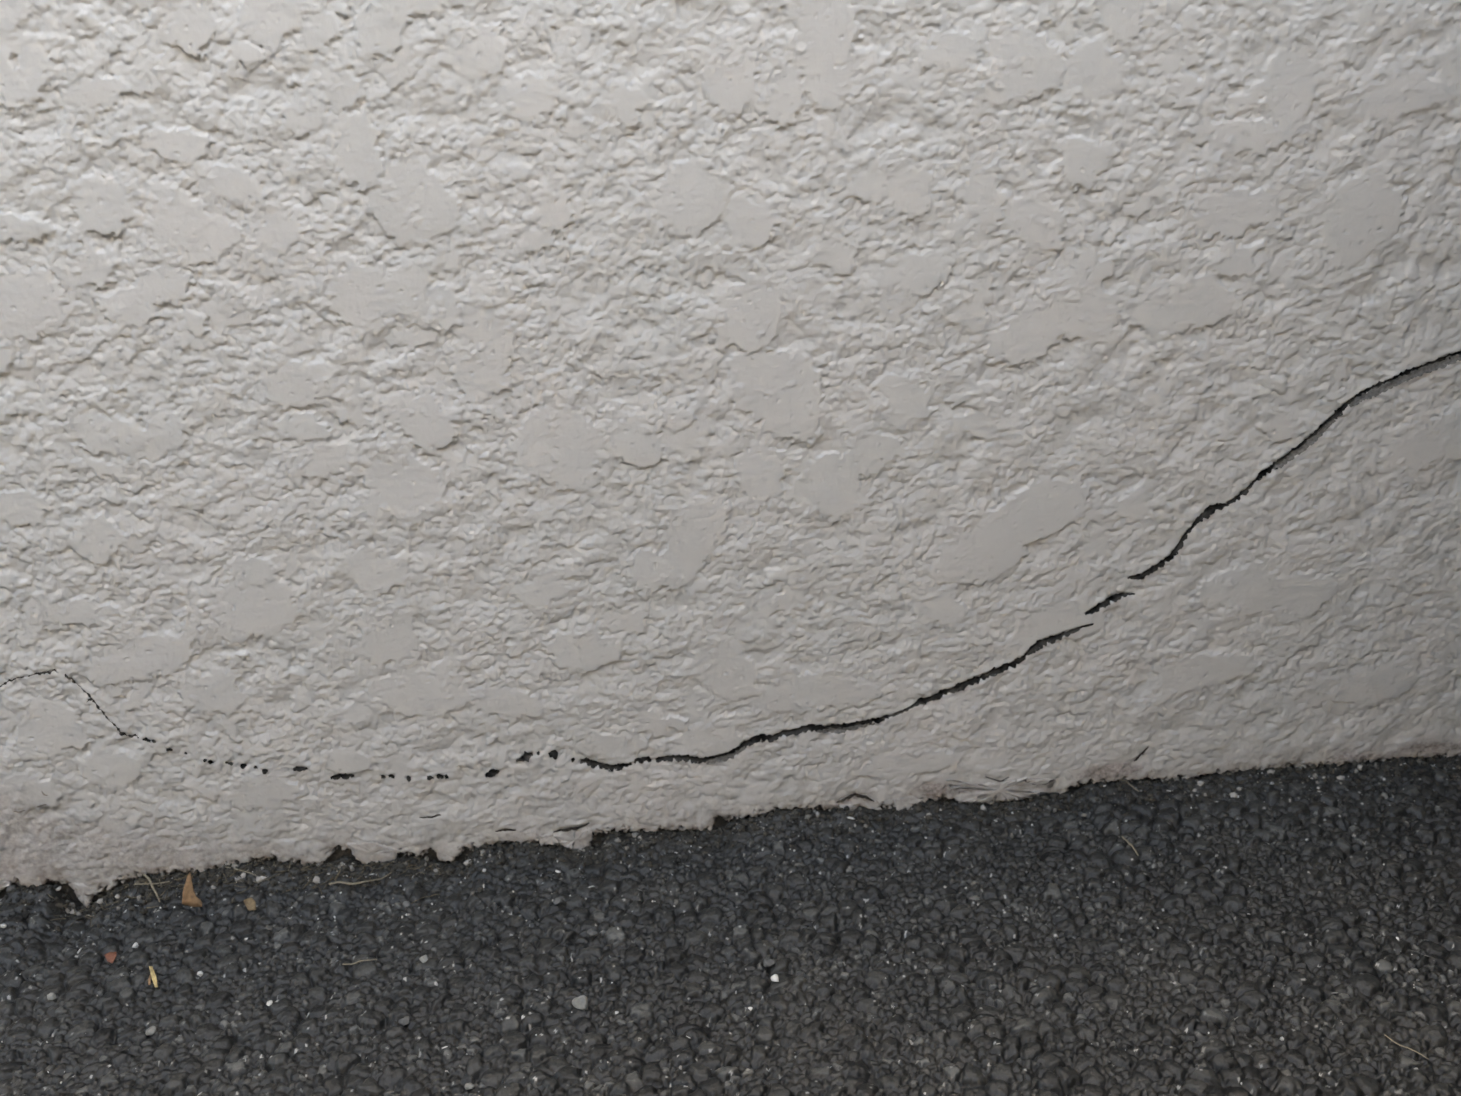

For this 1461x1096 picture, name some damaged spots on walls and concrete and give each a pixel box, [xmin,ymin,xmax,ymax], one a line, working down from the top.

crack [0,669,449,782]
crack [485,351,1461,778]